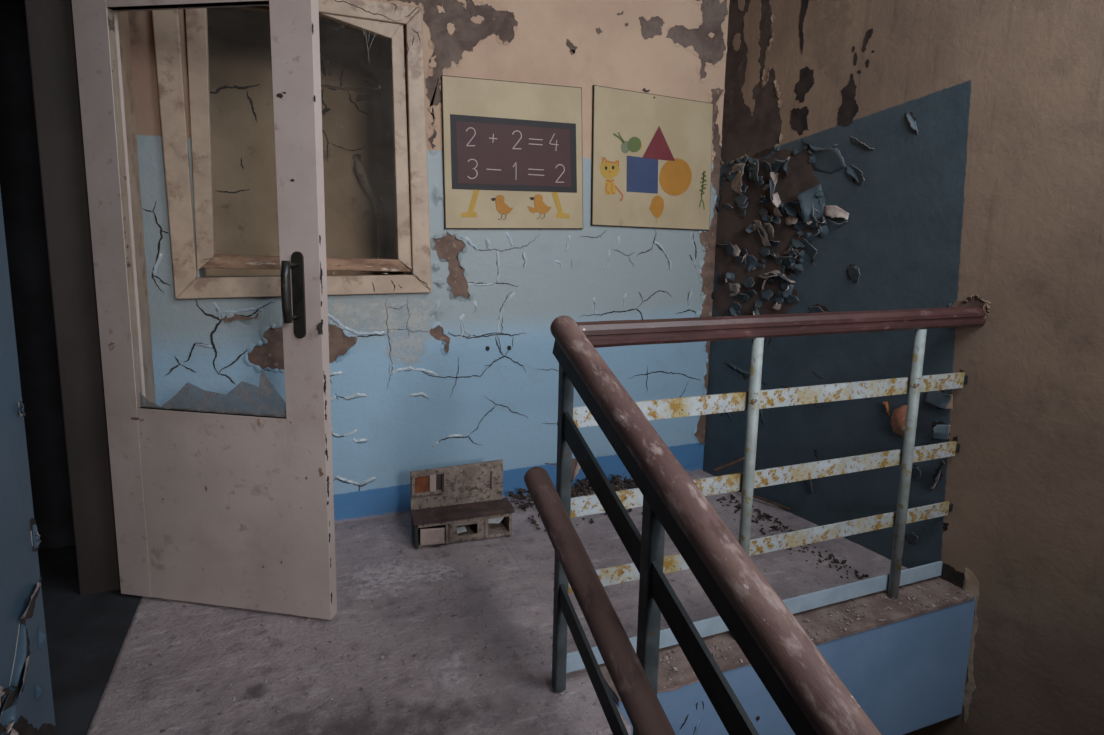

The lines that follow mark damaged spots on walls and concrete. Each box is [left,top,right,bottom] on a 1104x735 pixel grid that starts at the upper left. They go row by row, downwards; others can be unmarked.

peeling [314,51,341,118]
peeling [380,0,519,155]
peeling [837,28,875,150]
peeling [617,0,865,317]
crack [142,202,171,293]
peeling [430,230,474,302]
crack [555,231,697,320]
crack [165,297,275,385]
peeling [318,262,357,421]
crack [328,232,558,448]
crack [628,365,700,398]
crack [725,362,824,424]